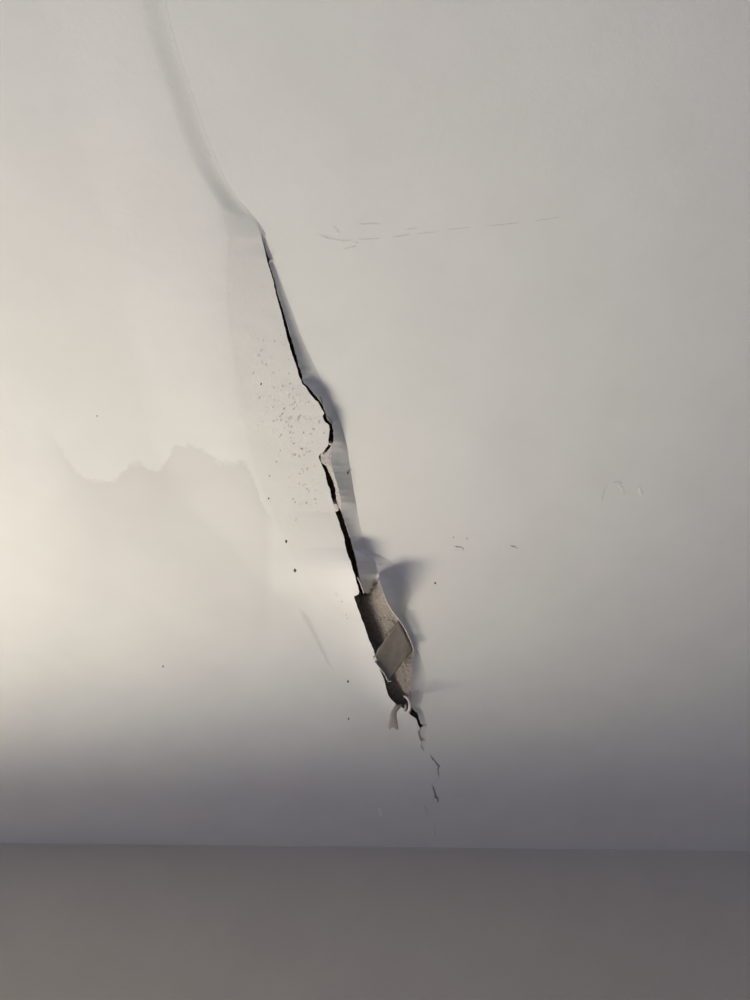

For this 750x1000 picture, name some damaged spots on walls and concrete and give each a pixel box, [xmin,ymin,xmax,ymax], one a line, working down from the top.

crack [262,238,370,596]
spalling [354,577,414,730]
crack [410,709,439,799]